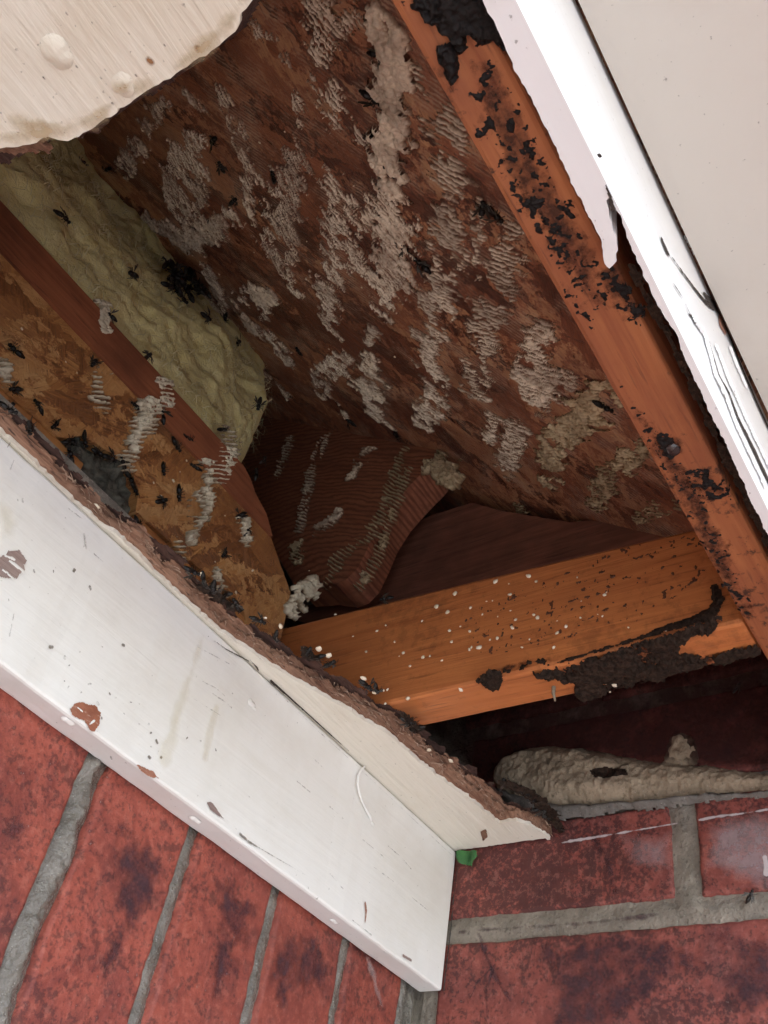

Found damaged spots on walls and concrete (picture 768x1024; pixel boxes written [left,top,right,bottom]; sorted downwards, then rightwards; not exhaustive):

damp [401,0,506,86]
damp [468,60,646,330]
damp [631,407,753,617]
peeling [0,549,27,580]
peeling [70,702,101,732]